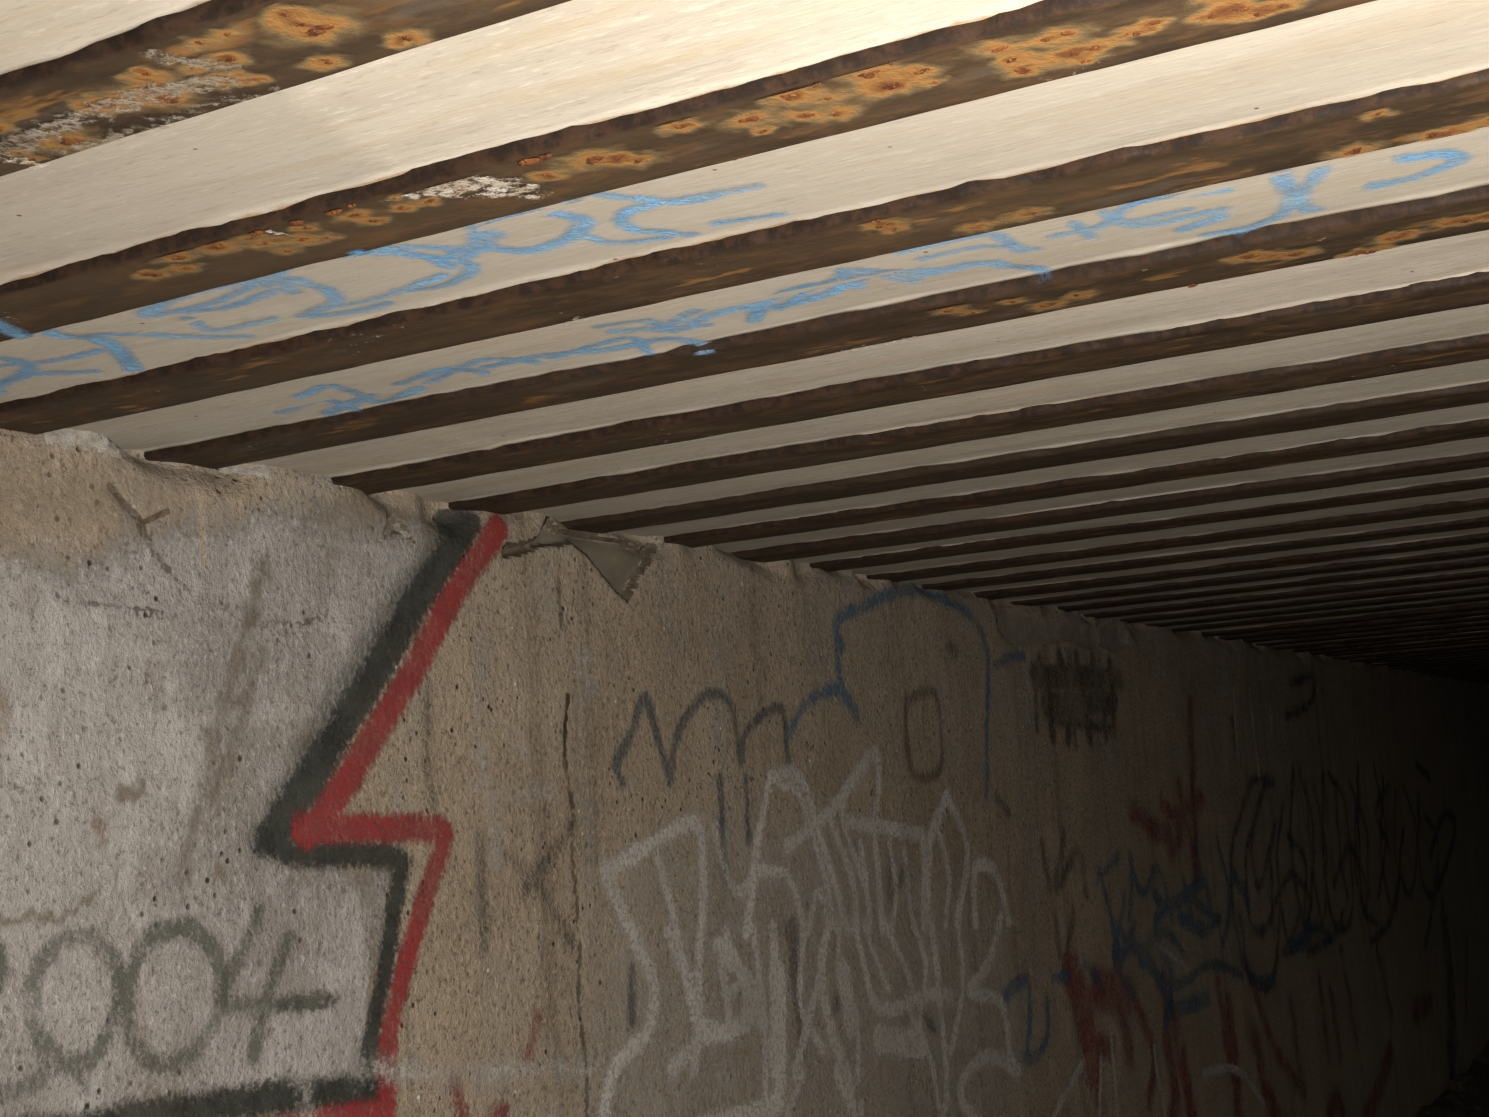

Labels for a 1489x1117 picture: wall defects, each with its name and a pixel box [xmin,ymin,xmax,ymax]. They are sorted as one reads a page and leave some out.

rust [260,5,359,71]
rust [973,0,1309,78]
efflorescence [0,50,259,169]
rust [0,28,273,165]
efflorescence [388,176,539,201]
rust [518,149,656,181]
rust [723,61,947,136]
rust [1329,143,1380,158]
rust [1408,116,1489,142]
rust [132,189,470,280]
spalling [502,516,657,603]
crack [562,693,570,758]